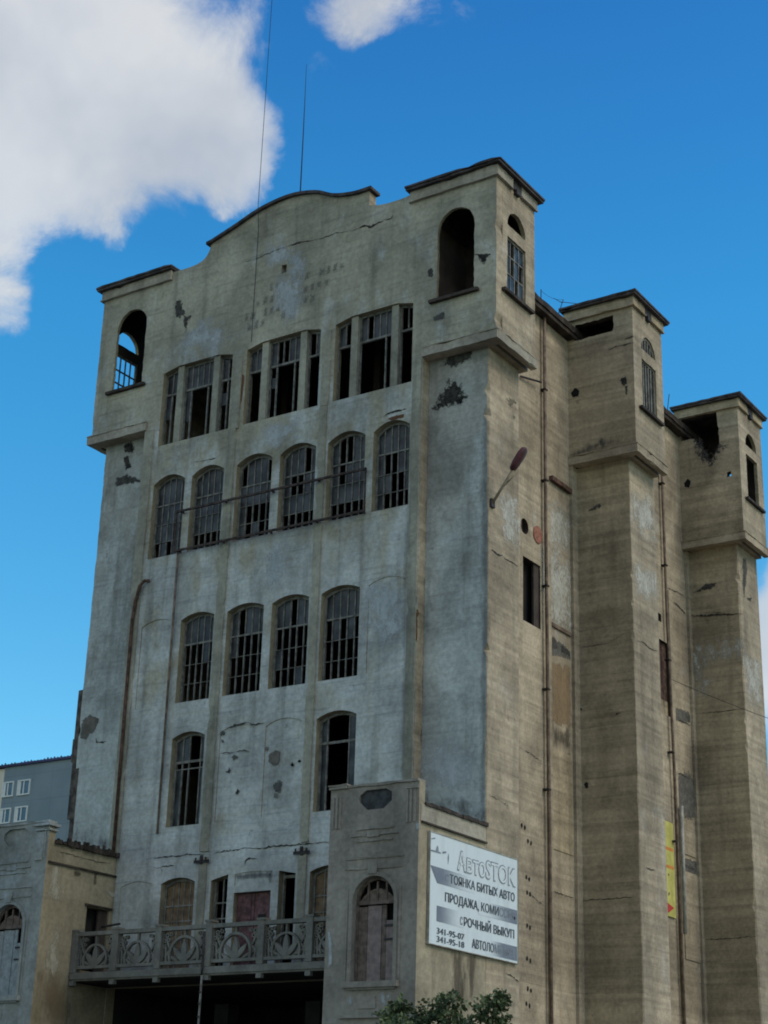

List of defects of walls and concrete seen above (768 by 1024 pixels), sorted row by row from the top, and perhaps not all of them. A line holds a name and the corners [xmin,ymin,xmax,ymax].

crack [246,215,393,262]
peeling [175,300,191,328]
peeling [432,352,472,410]
peeling [80,715,105,743]
peeling [265,747,301,767]
crack [158,842,328,870]